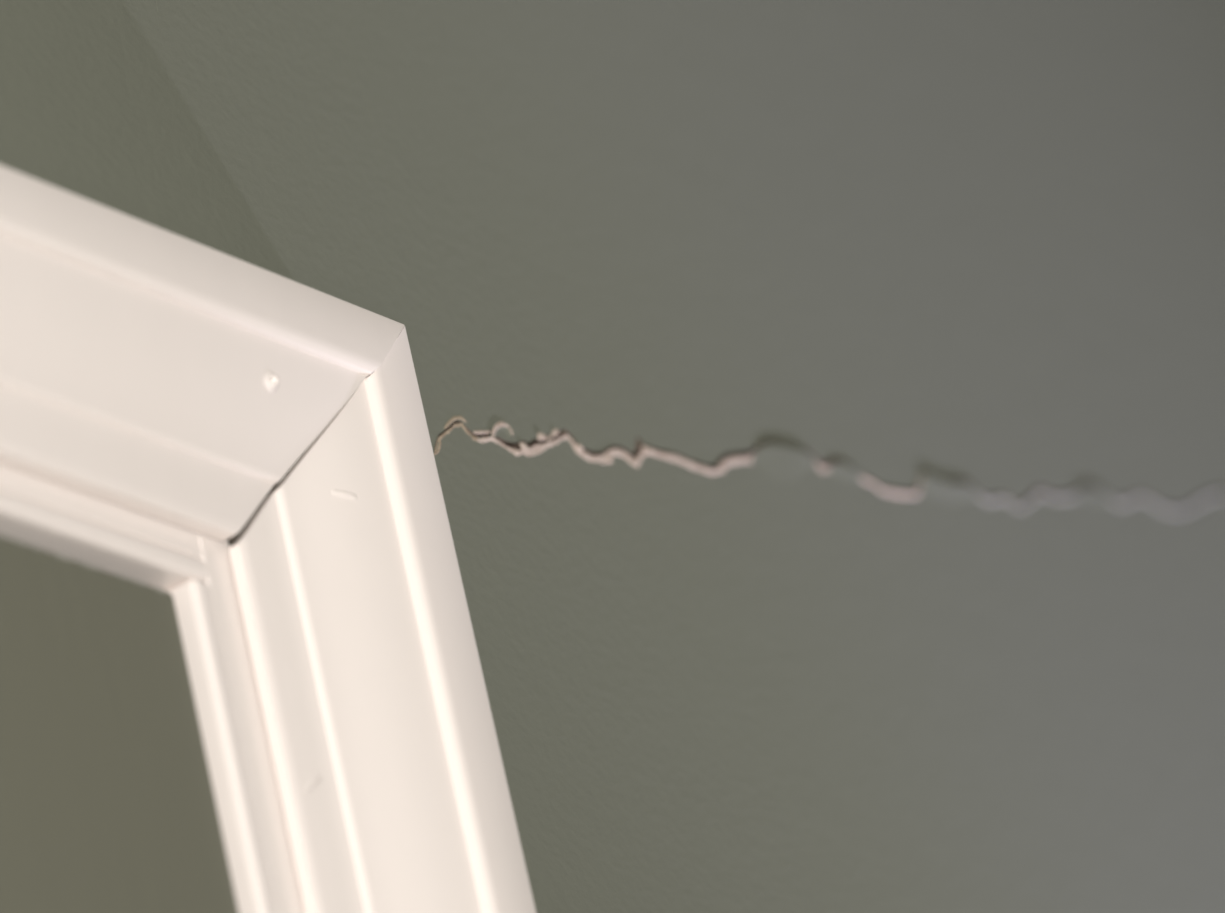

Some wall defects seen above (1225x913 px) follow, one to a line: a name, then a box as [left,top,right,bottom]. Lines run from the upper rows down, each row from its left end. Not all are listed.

crack [434,416,1225,515]